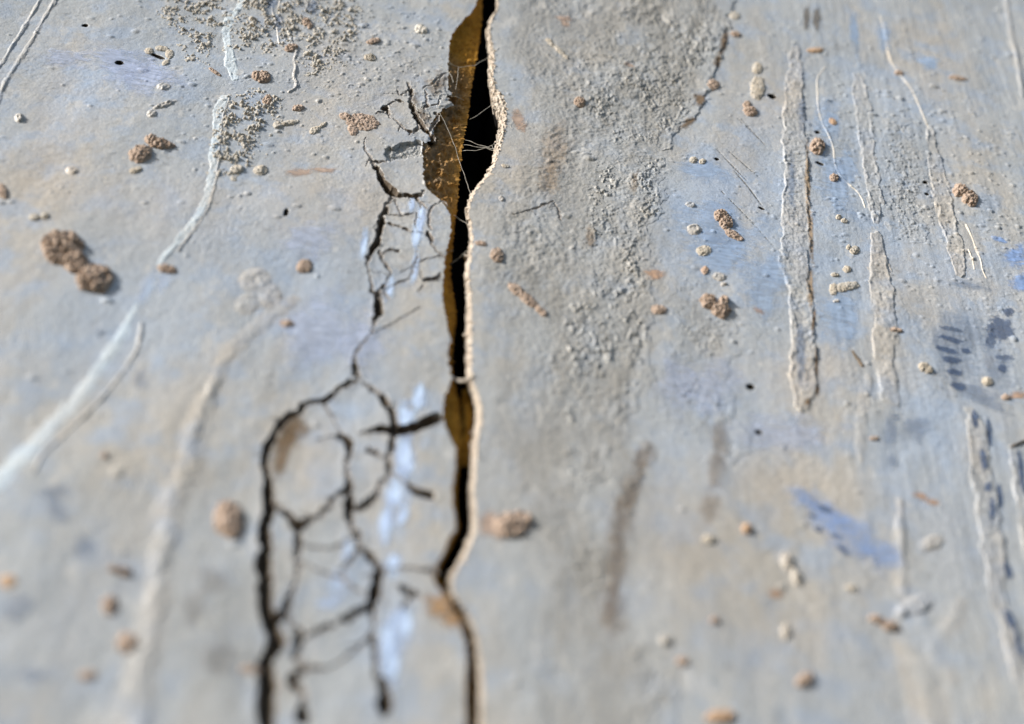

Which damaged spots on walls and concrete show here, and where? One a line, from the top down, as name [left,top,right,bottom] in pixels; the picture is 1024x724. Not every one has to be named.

crack [254,0,509,724]